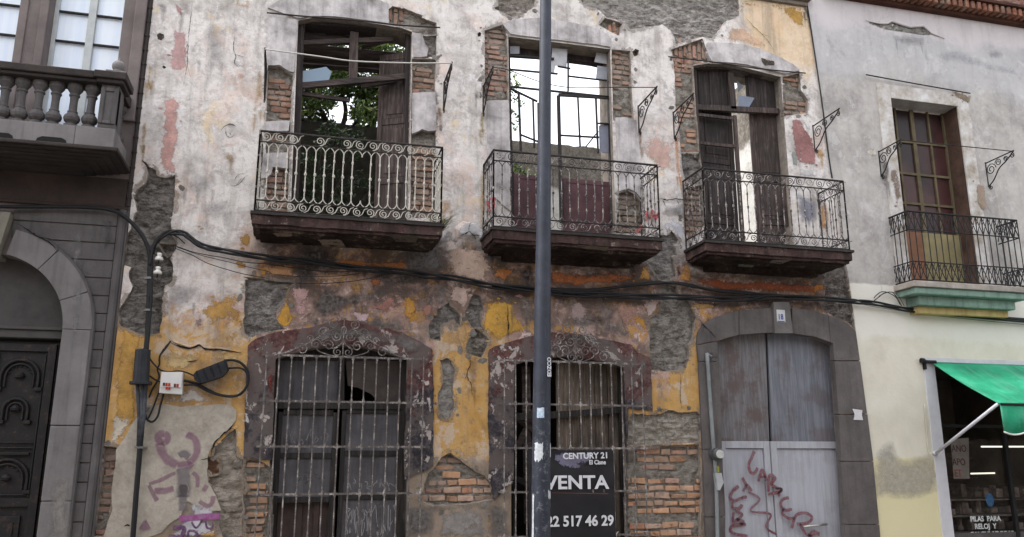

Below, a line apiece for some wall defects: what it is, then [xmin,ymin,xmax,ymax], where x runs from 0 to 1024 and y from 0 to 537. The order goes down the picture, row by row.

peeling [157,30,187,70]
spalling [389,6,443,221]
spalling [478,0,538,103]
spalling [551,0,855,377]
spalling [94,97,185,537]
spalling [350,221,525,432]
spalling [174,413,274,537]
spalling [416,447,513,515]
spalling [623,406,704,537]
damp [878,452,935,493]